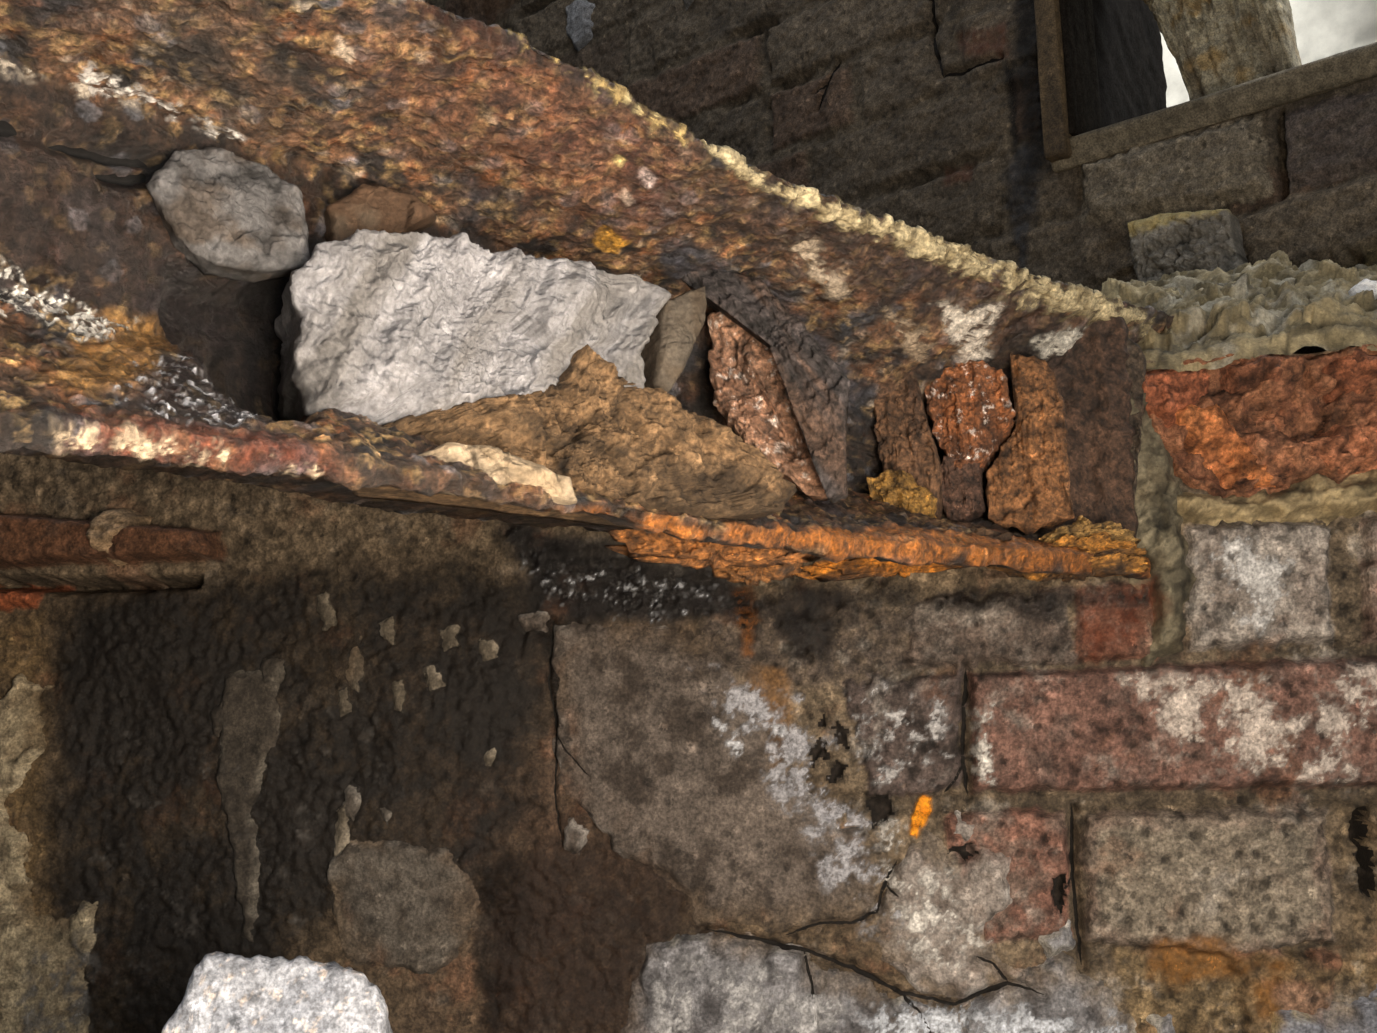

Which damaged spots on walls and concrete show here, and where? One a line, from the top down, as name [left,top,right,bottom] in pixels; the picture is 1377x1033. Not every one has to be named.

crack [930,0,1004,78]
water stain [58,428,174,459]
rust [604,529,966,652]
water stain [933,590,1152,618]
rust [986,515,1150,583]
water stain [23,524,914,1033]
crack [548,625,589,844]
water stain [714,688,982,969]
crack [705,859,1044,1033]
crack [944,670,968,795]
crack [1059,804,1082,965]